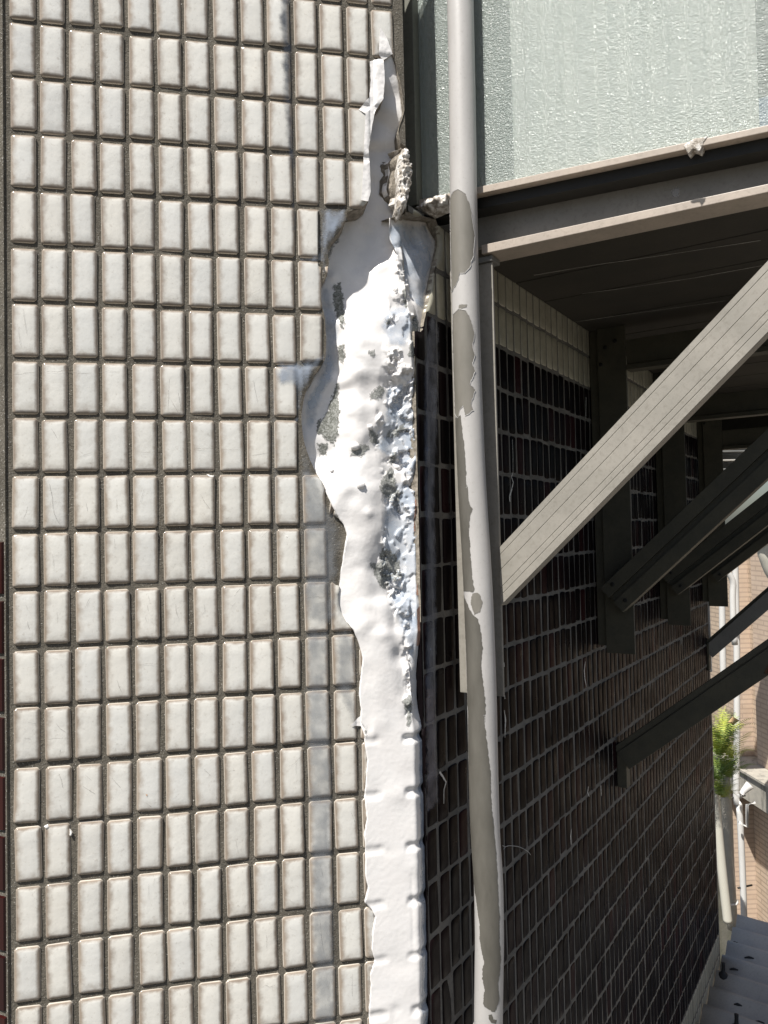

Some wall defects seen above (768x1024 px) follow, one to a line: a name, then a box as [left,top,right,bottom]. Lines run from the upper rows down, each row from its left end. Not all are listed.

spalling [301,344,346,466]
spalling [321,201,368,329]
spalling [351,57,475,739]
peeling [452,304,501,1024]
spalling [421,753,430,1024]